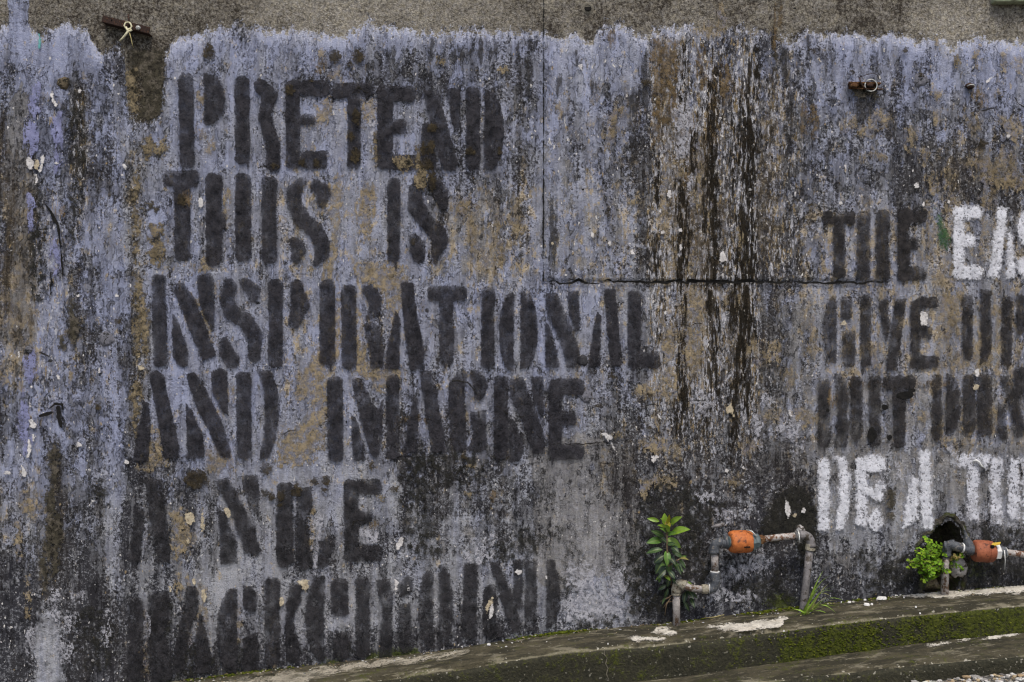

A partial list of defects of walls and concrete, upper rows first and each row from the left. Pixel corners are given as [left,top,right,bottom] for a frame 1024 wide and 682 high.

peeling [124,47,170,166]
water stain [626,52,652,170]
crack [542,0,888,285]
water stain [547,198,559,266]
water stain [650,232,660,279]
water stain [670,2,796,467]
water stain [776,414,804,454]
water stain [38,440,118,672]
water stain [356,520,379,544]
water stain [376,442,496,569]
water stain [464,475,820,642]
spalling [914,512,972,594]